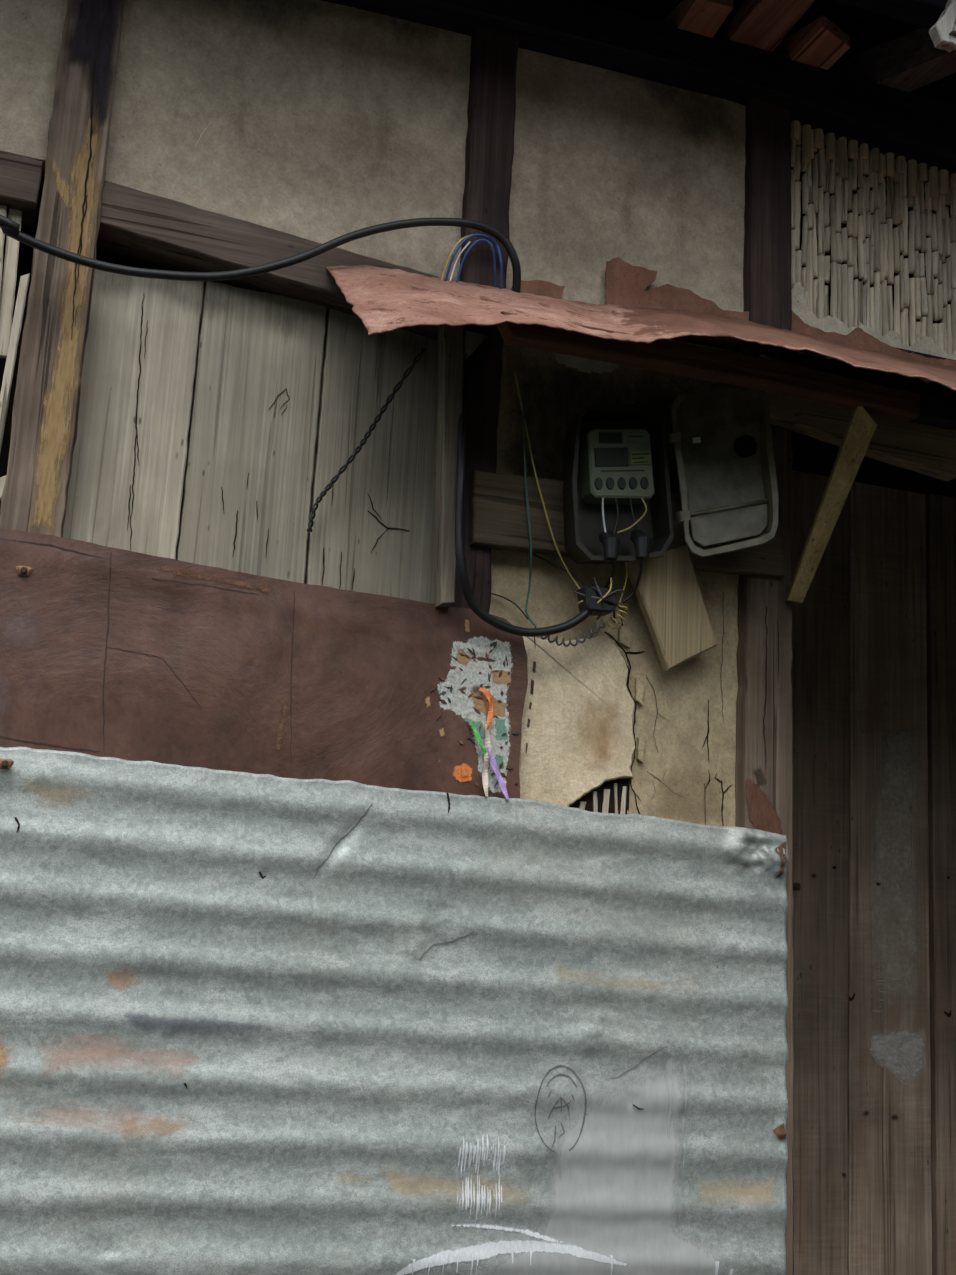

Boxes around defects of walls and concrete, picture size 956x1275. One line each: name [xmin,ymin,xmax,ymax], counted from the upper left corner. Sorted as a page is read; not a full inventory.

rust [453,763,472,782]
peeling [425,626,645,815]
crack [604,593,731,826]
crack [763,606,779,757]